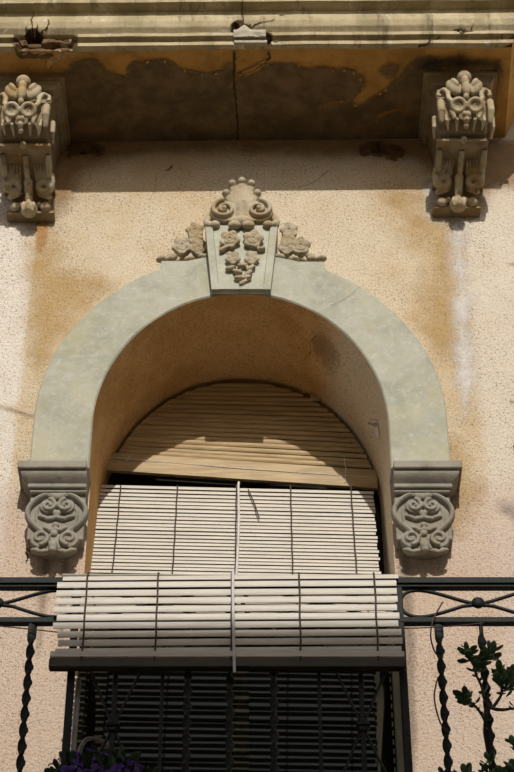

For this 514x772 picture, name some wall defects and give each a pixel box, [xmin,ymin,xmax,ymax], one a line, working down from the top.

spalling [13,15,78,59]
crack [232,52,271,140]
peeling [64,56,440,161]
damp [51,140,432,205]
damp [475,141,514,200]